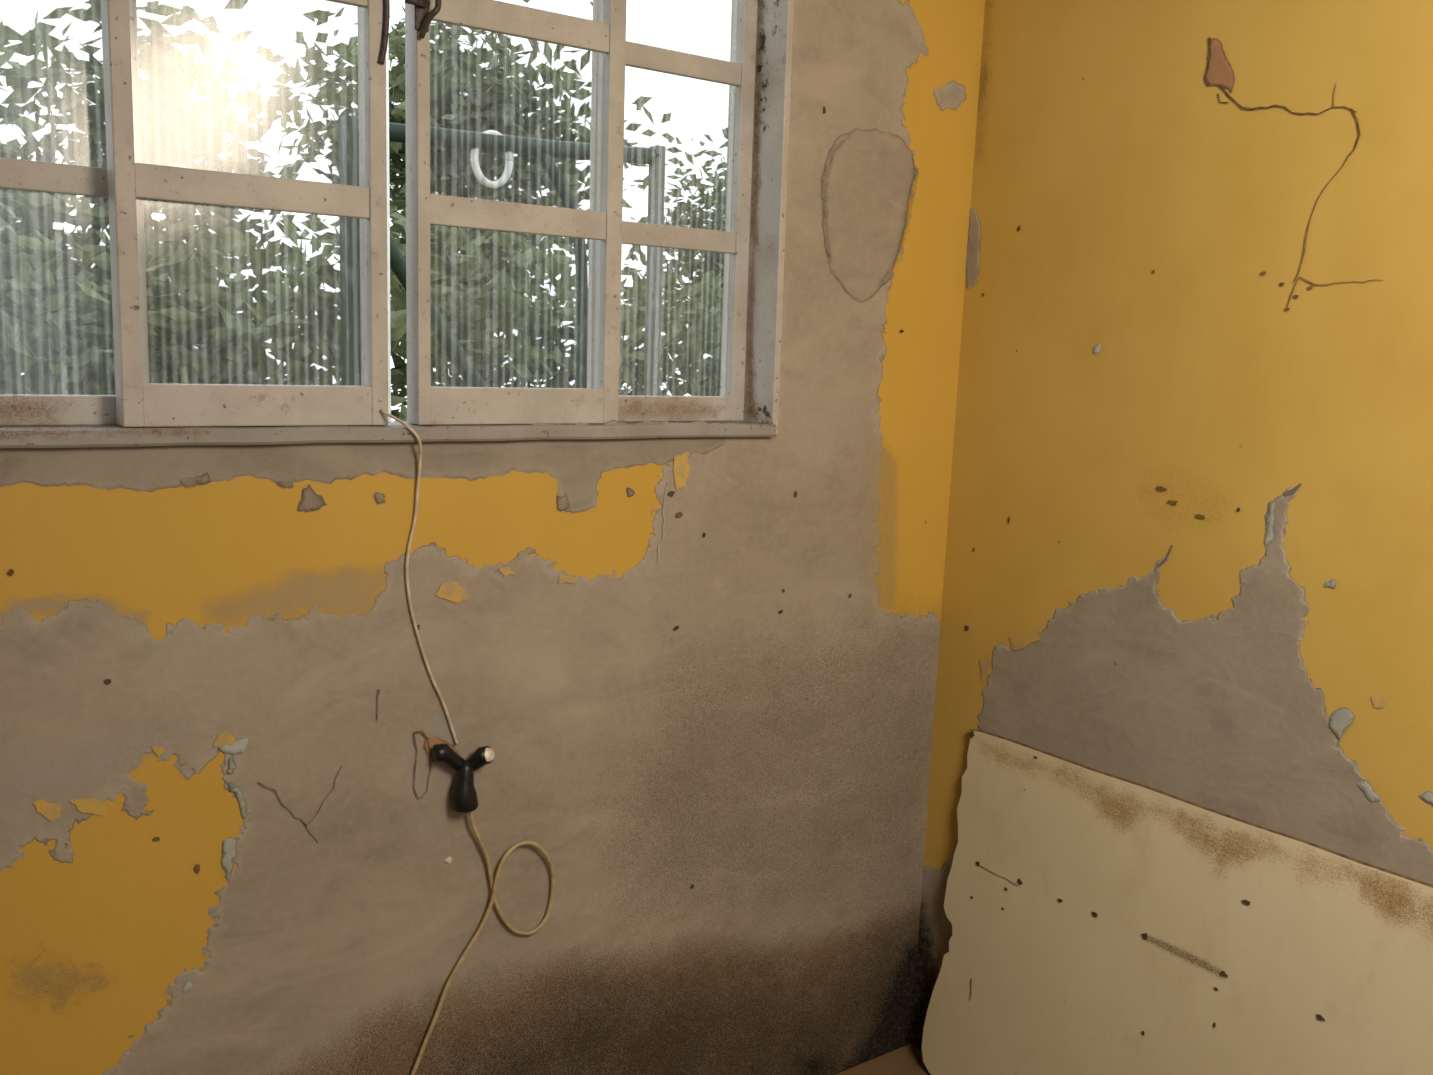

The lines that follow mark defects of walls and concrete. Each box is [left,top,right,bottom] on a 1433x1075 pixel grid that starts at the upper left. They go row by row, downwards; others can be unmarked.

peeling [933,60,990,113]
peeling [966,208,981,289]
crack [1217,83,1383,311]
peeling [0,0,958,1075]
leakage [262,592,942,1075]
peeling [977,483,1433,885]